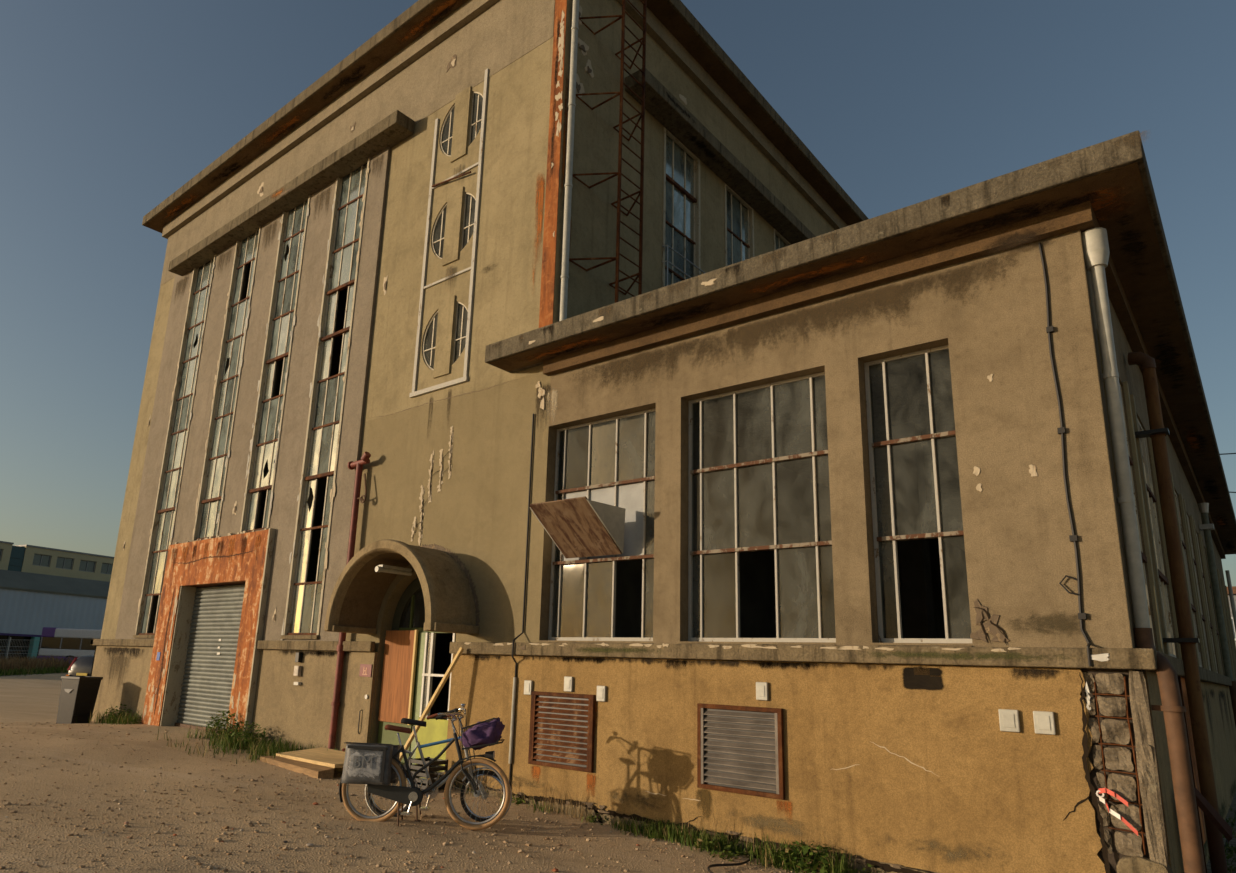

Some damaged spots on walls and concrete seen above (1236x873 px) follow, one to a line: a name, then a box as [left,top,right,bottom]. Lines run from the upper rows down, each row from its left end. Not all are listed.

peeling [555,5,594,137]
rust [533,0,571,328]
damp [519,325,601,361]
damp [596,187,1146,381]
rust [172,535,261,567]
rust [153,588,175,718]